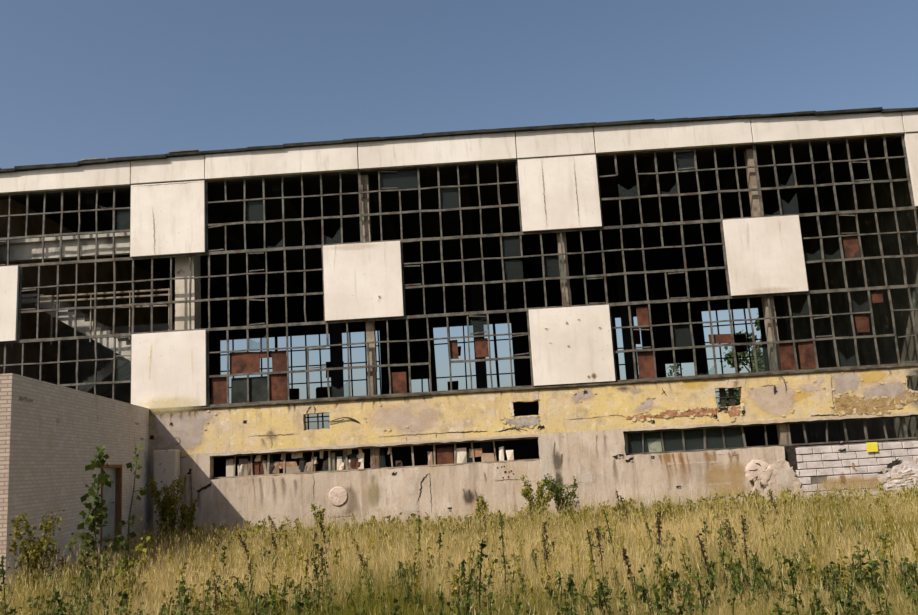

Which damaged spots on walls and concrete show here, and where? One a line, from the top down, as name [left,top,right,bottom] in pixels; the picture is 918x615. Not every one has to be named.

spalling [501,401,545,429]
spalling [626,388,746,423]
spalling [749,371,918,417]
crack [416,473,432,513]
leakage [374,434,563,494]
spalling [767,458,803,499]
spalling [878,458,918,492]